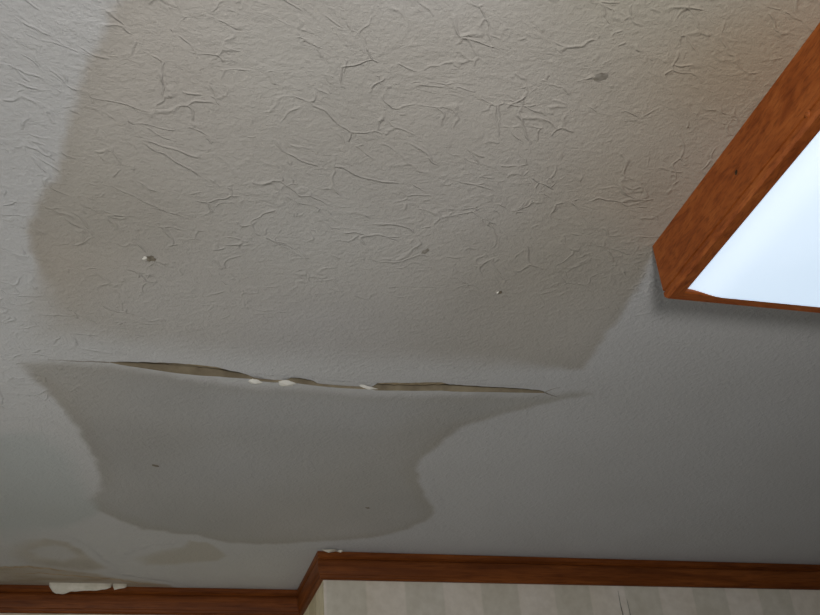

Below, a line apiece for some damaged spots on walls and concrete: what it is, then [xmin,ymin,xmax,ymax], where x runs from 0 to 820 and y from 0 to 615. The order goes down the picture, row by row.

water stain [7,0,820,387]
water stain [0,351,606,573]
crack [63,360,560,397]
peeling [49,583,127,594]